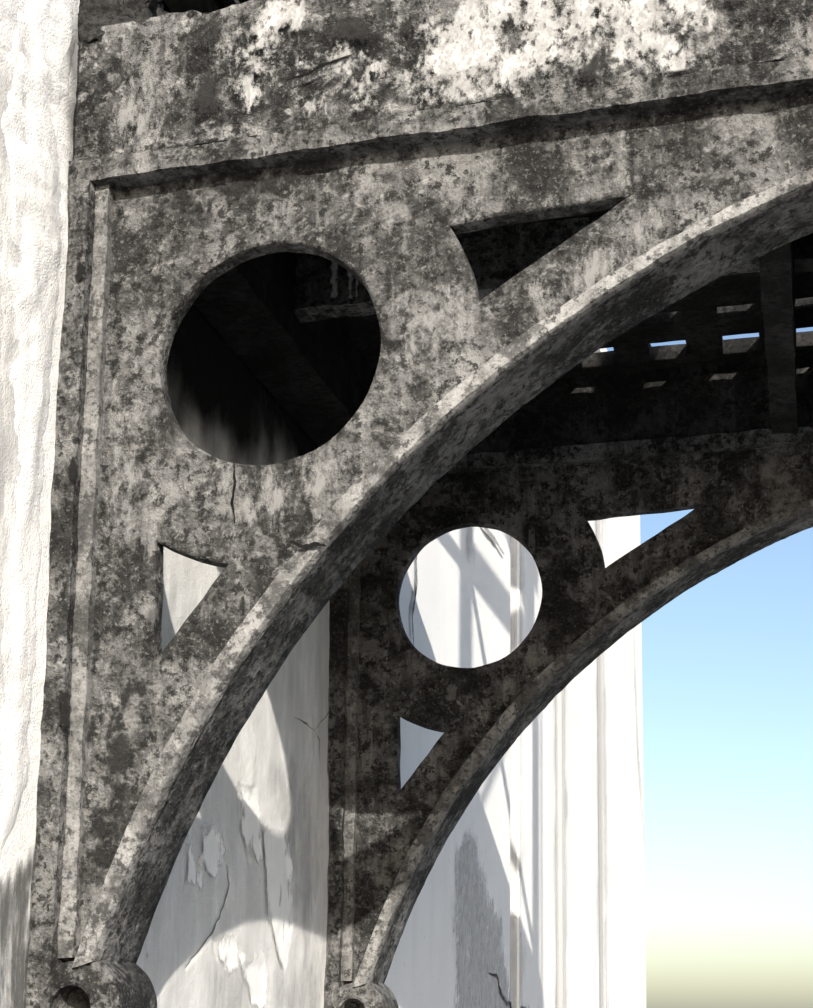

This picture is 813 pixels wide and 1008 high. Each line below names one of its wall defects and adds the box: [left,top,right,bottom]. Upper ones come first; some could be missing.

rust [0,851,37,1008]
flaking render [187,827,224,889]
flaking render [219,933,267,1008]
flaking render [239,781,293,968]